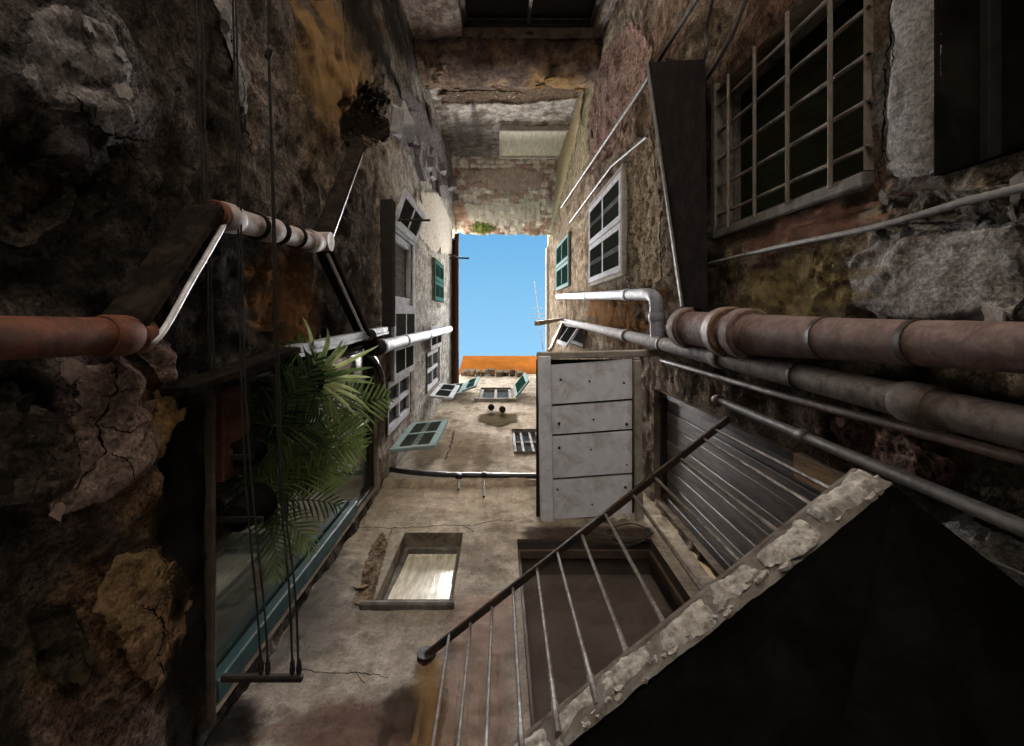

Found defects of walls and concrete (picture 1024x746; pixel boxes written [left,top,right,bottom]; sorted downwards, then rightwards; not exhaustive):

water stain [342,0,418,95]
crack [70,93,146,166]
spalling [337,17,662,289]
flaking render [847,171,1024,322]
flaking render [0,358,186,522]
crack [52,365,148,507]
water stain [479,412,518,426]
flaking render [91,545,193,692]
crack [302,669,388,683]
spalling [353,533,388,605]
corrosion [411,655,442,746]
flaking render [513,470,884,746]